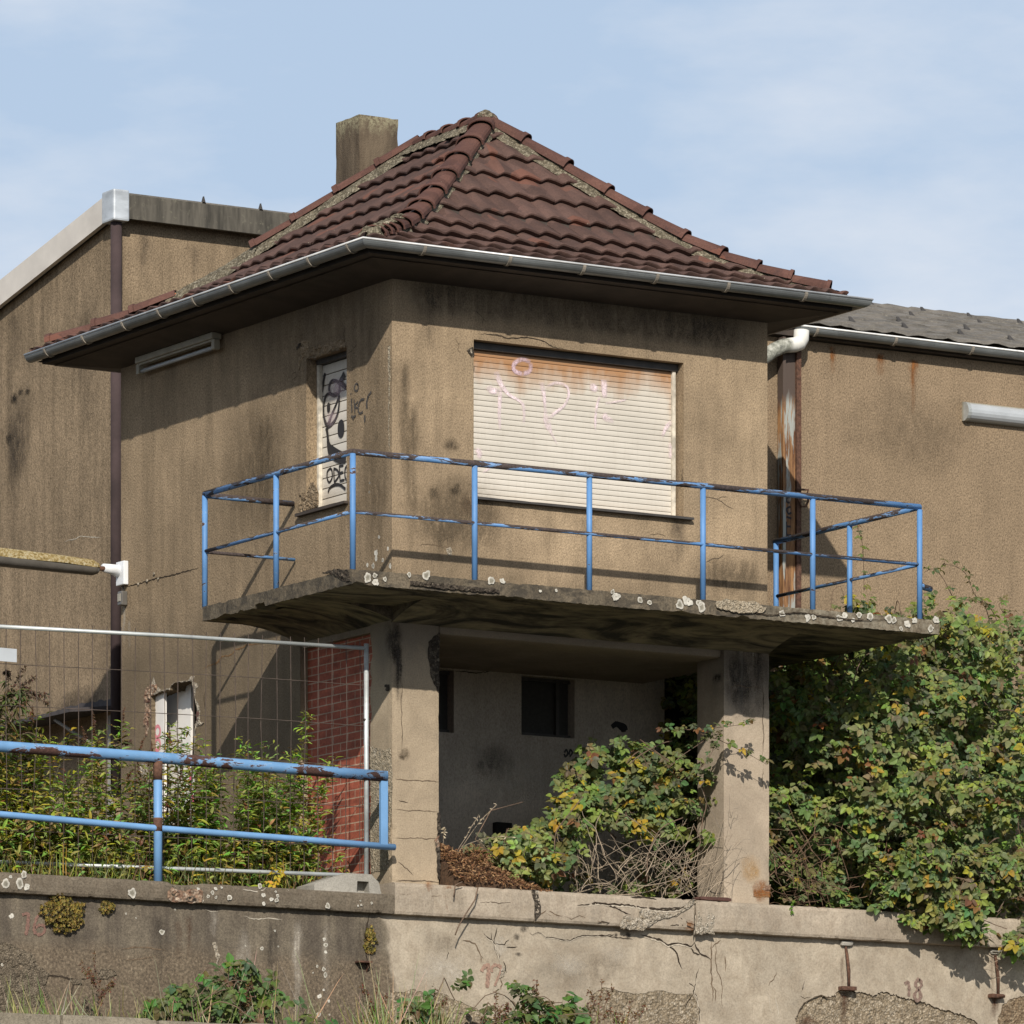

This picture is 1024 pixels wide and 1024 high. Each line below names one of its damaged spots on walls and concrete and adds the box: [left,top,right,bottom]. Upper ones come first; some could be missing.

spalling [143,676,204,736]
spalling [620,899,715,935]
crack [447,896,726,1023]
spalling [584,987,699,1024]
spalling [795,991,976,1024]